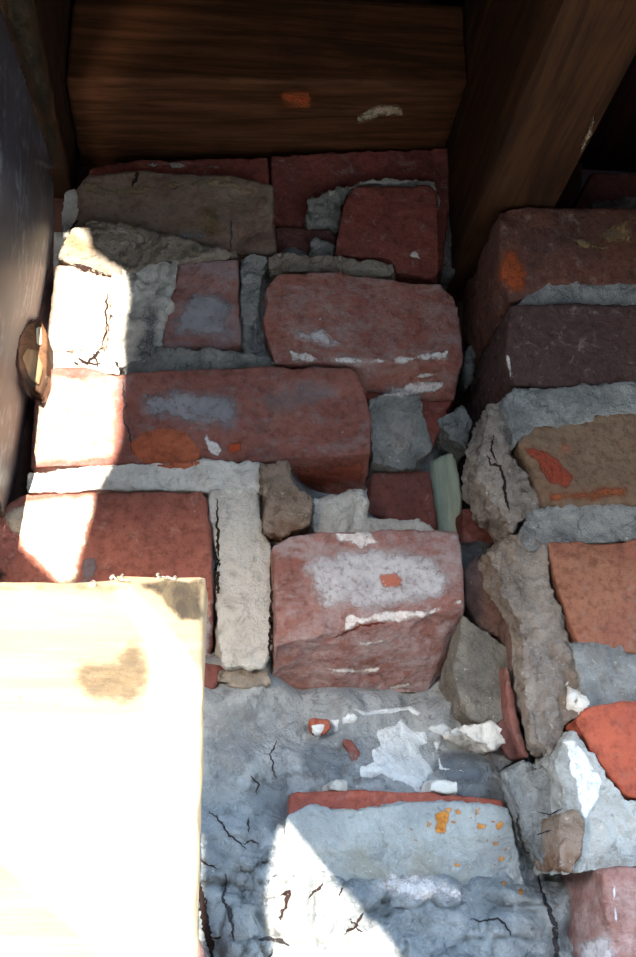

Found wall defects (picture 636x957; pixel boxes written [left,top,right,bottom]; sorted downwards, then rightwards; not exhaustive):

crack [487,435,510,513]
damp [305,532,445,629]
crack [251,741,277,794]
crack [209,812,259,849]
crack [515,809,561,854]
crack [198,860,235,957]
crack [259,883,343,957]
crack [345,913,364,934]
crack [470,917,512,937]
crack [538,876,560,957]